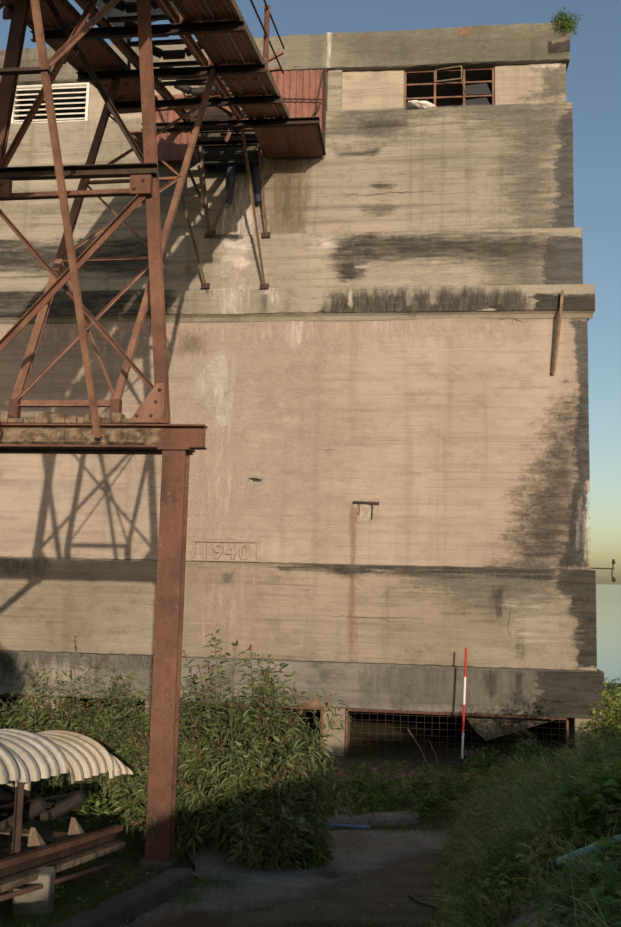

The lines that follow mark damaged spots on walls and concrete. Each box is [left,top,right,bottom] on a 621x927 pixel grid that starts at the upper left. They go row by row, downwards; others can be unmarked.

water stain [0,238,149,276]
water stain [0,290,152,356]
water stain [164,102,605,719]
water stain [0,557,47,576]
water stain [0,651,153,684]